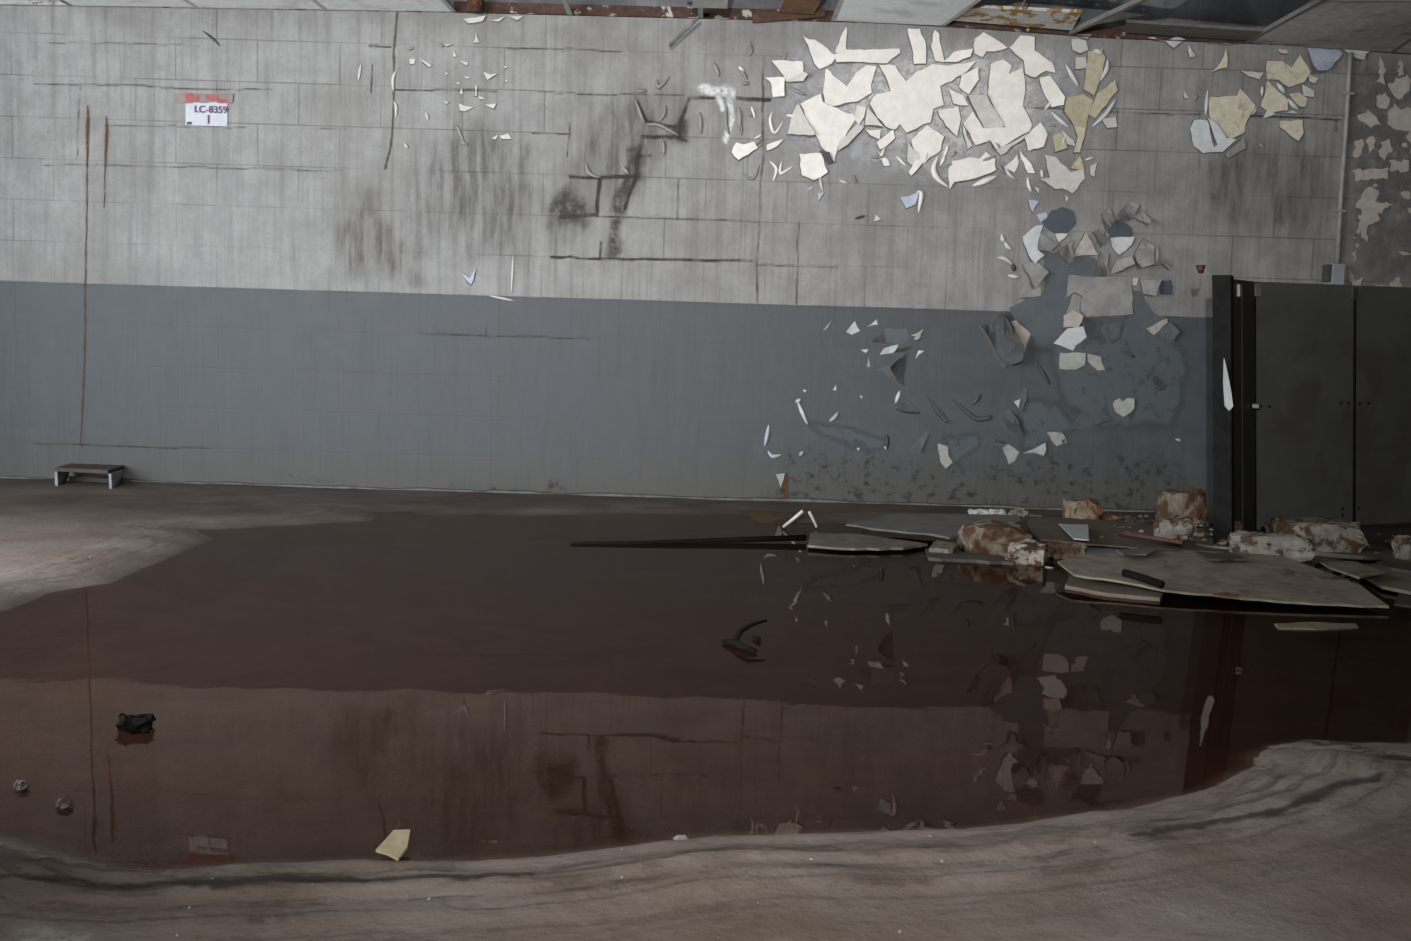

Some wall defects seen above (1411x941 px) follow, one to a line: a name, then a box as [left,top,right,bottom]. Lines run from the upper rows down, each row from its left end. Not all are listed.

rust [80,106,108,447]
leakage [552,195,584,220]
leakage [609,149,640,255]
peeling [634,76,679,155]
crack [532,78,797,304]
leakage [672,122,686,140]
peeling [724,4,1187,470]
peeling [1125,19,1411,287]
peeling [764,425,789,498]